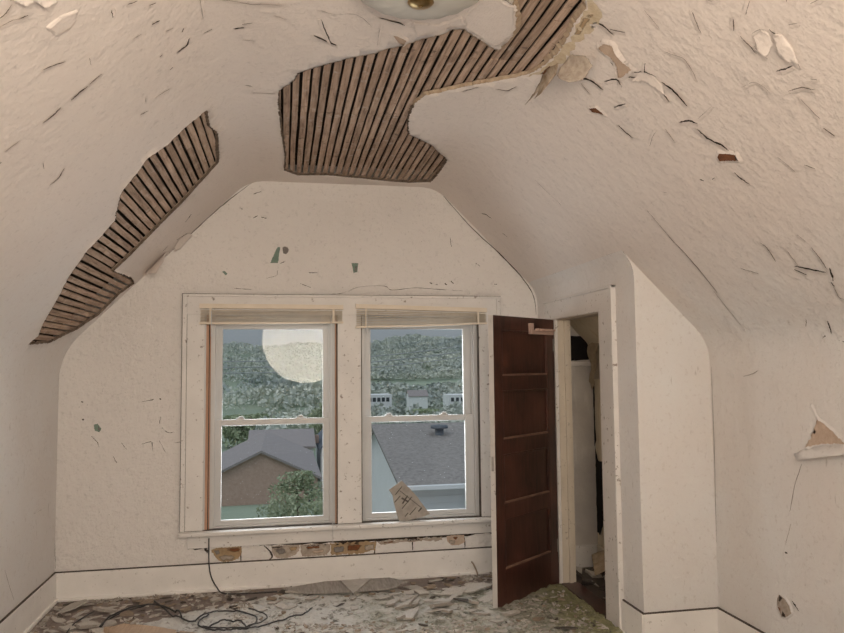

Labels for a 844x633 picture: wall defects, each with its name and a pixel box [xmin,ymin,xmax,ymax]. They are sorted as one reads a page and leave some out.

crack [0,0,29,30]
crack [42,56,102,125]
crack [111,0,287,117]
flaking render [277,0,602,183]
flaking render [29,111,220,345]
crack [163,183,267,251]
peeling [269,246,289,264]
crack [646,209,746,331]
peeling [794,404,844,461]
spalling [211,546,242,562]
spalling [271,535,465,559]
peeling [776,592,794,620]